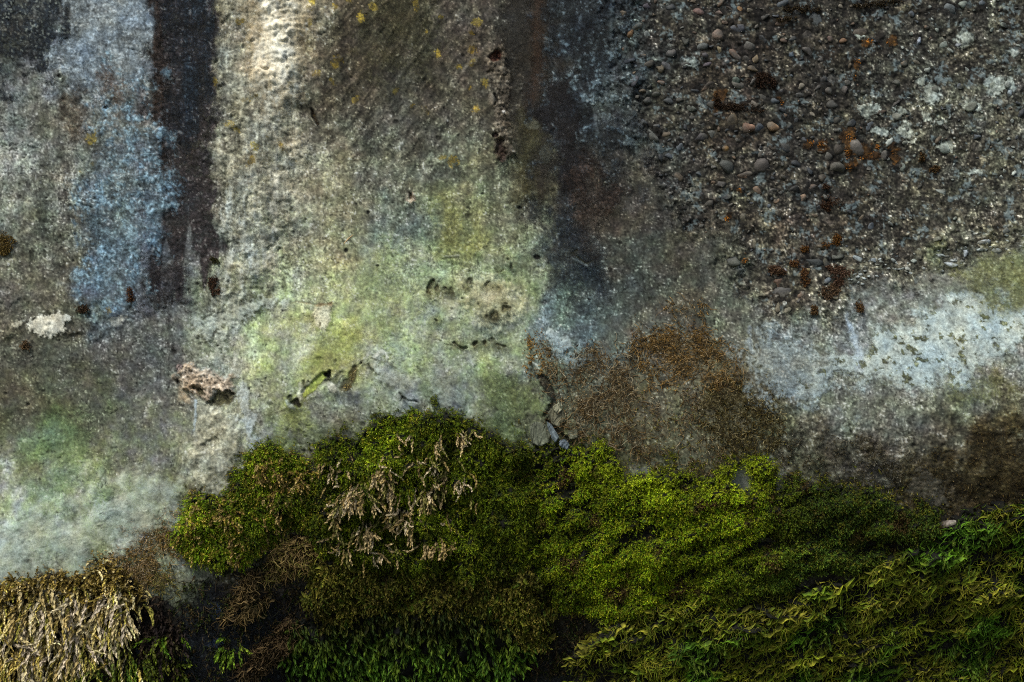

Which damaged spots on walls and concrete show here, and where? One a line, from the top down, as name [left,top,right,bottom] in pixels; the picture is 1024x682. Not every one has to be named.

leakage [0,0,308,452]
spalling [172,363,239,497]